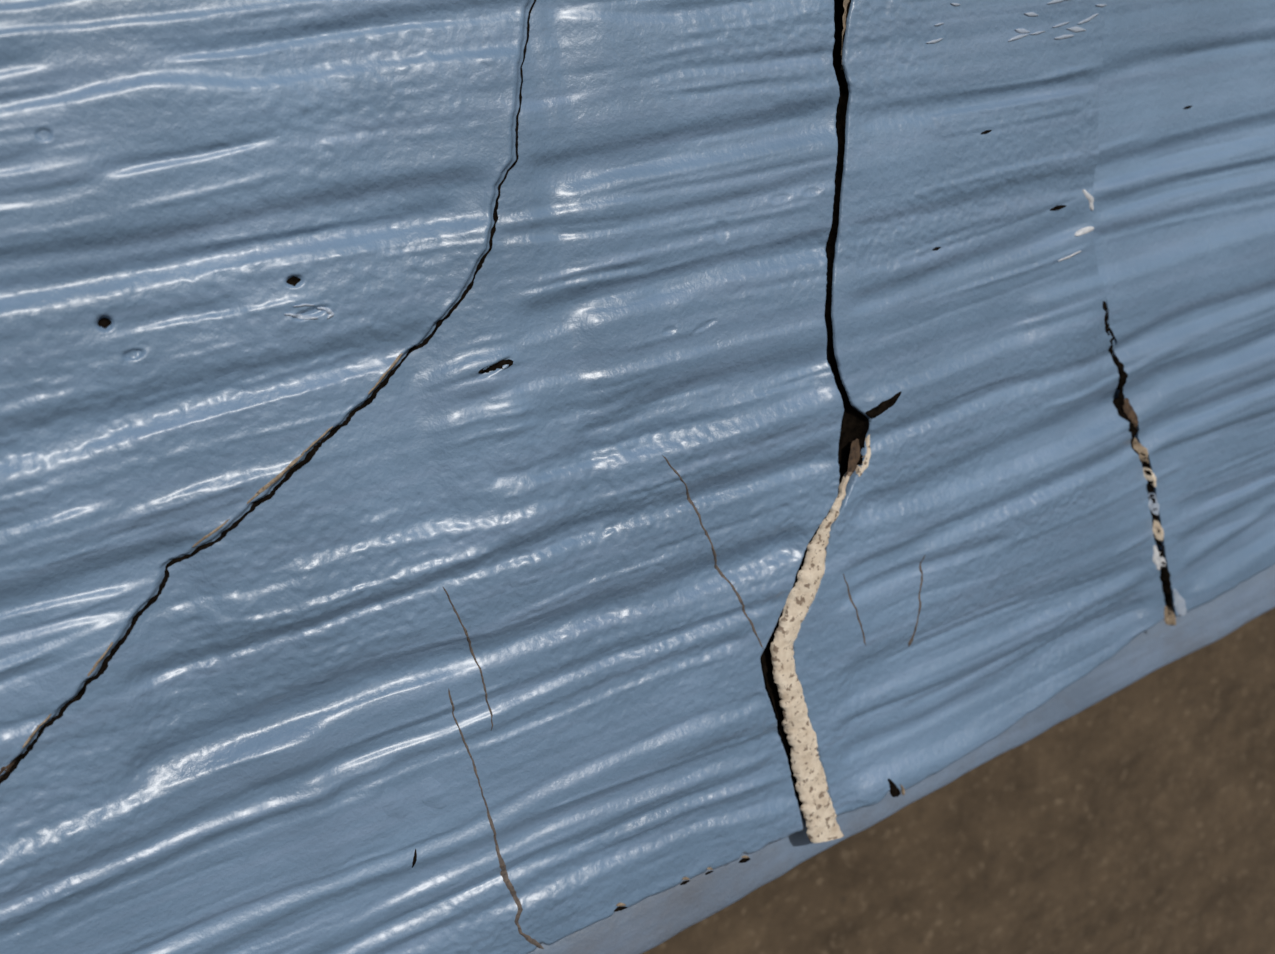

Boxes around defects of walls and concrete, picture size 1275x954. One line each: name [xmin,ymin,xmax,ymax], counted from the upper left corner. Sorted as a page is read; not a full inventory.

crack [0,0,536,784]
crack [443,587,544,949]
crack [662,0,901,843]
crack [908,555,925,647]
crack [1102,301,1174,613]